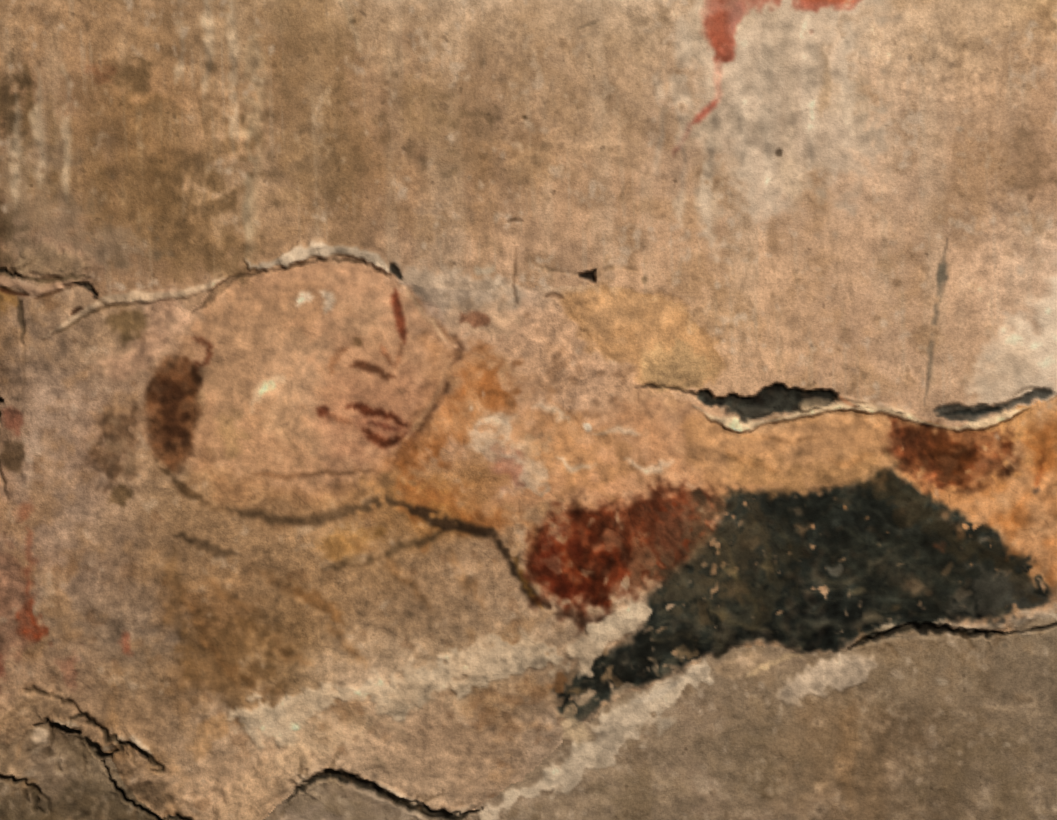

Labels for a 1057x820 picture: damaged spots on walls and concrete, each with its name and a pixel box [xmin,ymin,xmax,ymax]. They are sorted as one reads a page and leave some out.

crack [187,256,392,322]
crack [0,255,120,419]
crack [633,381,703,398]
crack [831,394,869,407]
crack [1010,386,1045,400]
crack [0,465,11,502]
crack [847,616,1057,661]
crack [0,685,194,820]
damp [0,756,222,820]
damp [269,782,400,820]
crack [273,748,484,820]
damp [761,681,957,820]